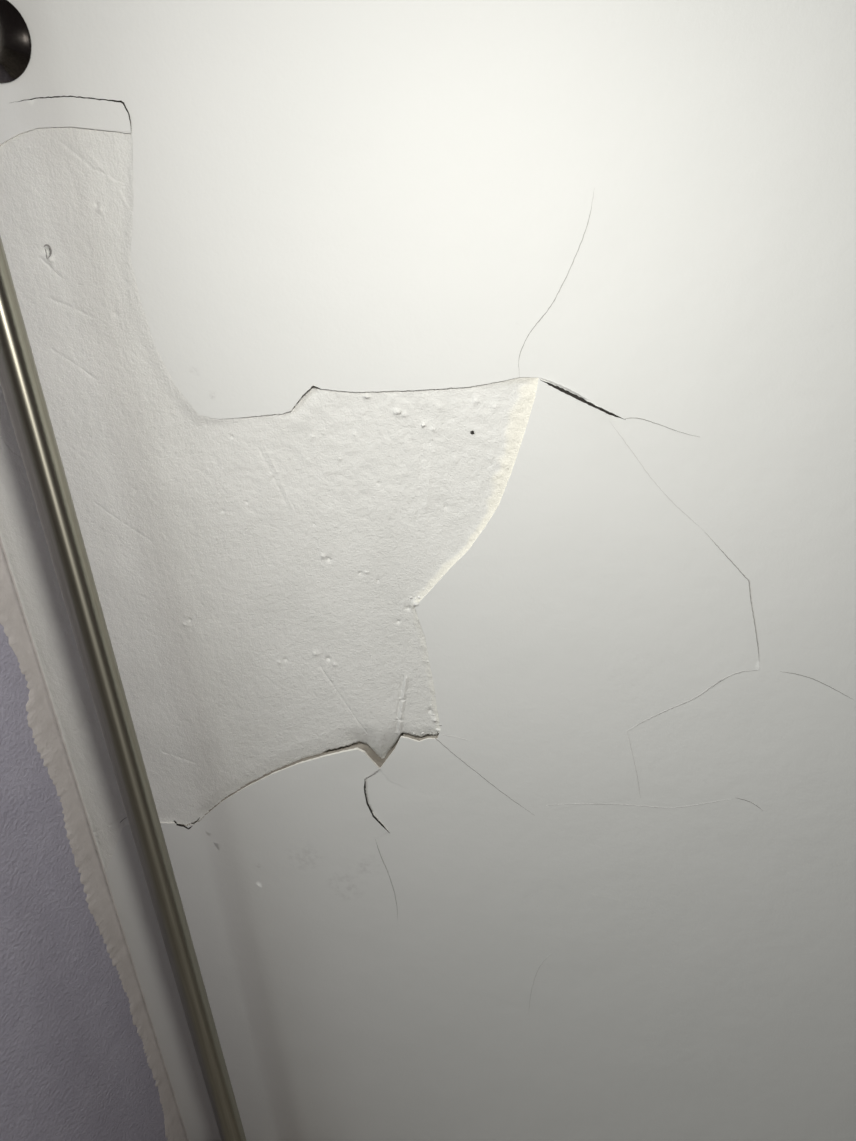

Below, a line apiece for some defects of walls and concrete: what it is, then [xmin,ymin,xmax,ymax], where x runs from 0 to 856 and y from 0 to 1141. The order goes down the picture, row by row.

crack [11,96,131,125]
peeling [0,127,539,873]
crack [429,193,852,815]
crack [364,770,398,916]